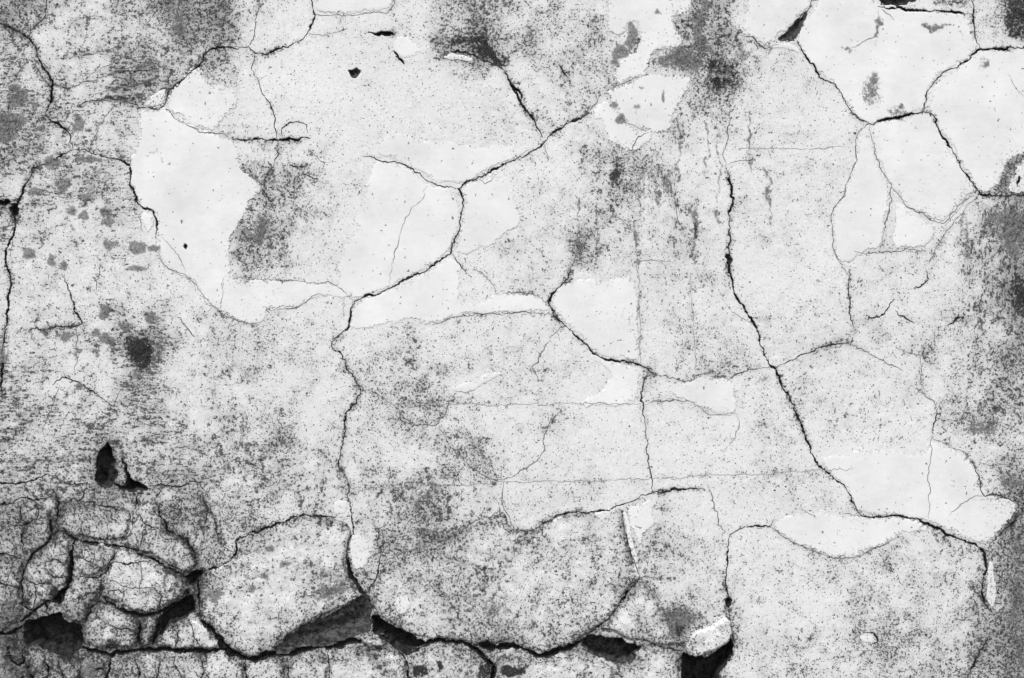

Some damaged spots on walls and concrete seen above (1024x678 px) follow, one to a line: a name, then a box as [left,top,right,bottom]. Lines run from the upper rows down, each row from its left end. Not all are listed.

crack [368,31,404,64]
water stain [654,0,735,88]
crack [0,0,395,325]
crack [741,0,1024,325]
crack [0,217,16,399]
crack [31,274,122,431]
crack [252,50,1006,632]
crack [0,459,409,678]
flaking render [0,442,734,678]
crack [423,638,581,678]
crack [944,443,1024,542]